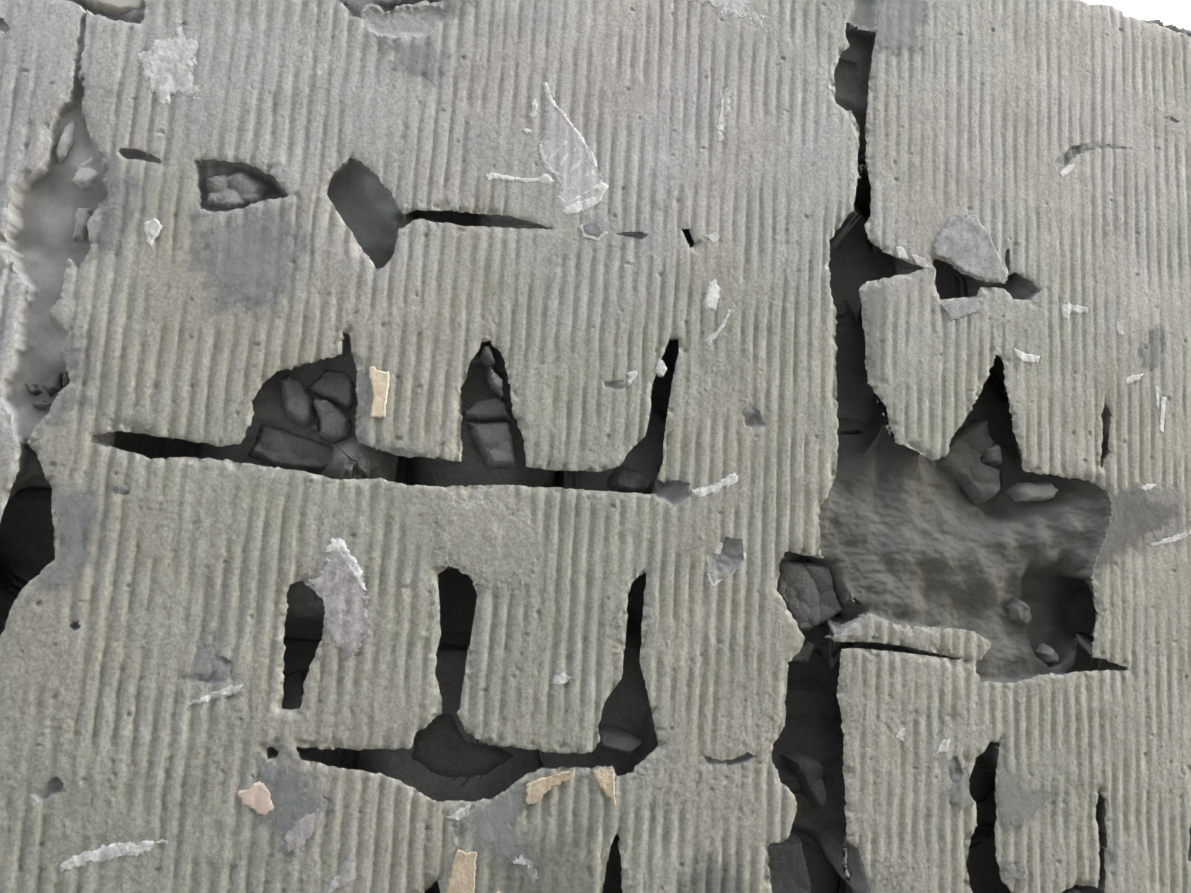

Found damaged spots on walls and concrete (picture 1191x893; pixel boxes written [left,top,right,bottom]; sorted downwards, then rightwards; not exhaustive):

spalling [360,5,447,38]
crack [830,22,879,255]
crack [406,209,548,230]
spalling [811,354,1128,684]
spalling [282,670,309,710]
spalling [296,572,658,802]
spalling [266,747,279,760]
peeling [946,756,964,784]
crack [1183,827,1191,861]
peeling [833,836,871,893]